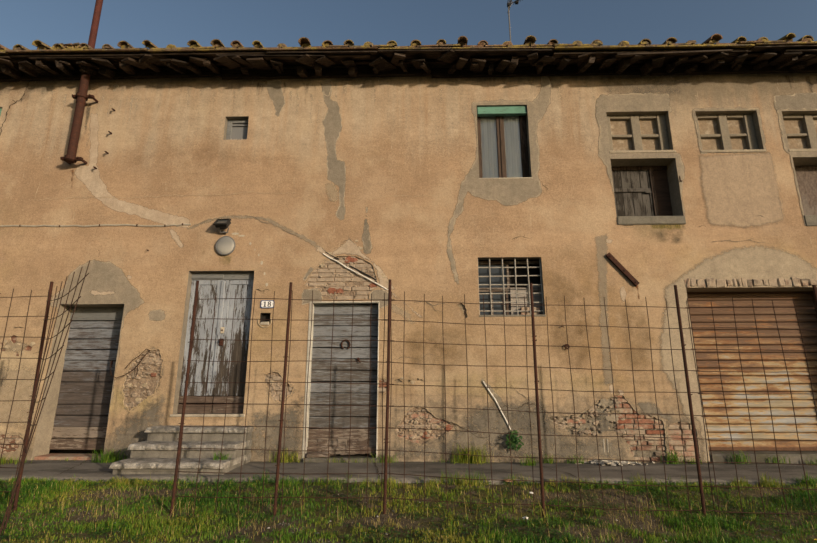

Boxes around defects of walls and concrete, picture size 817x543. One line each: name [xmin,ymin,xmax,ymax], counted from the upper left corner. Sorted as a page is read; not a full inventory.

crack [0,81,30,135]
flaking render [303,239,395,300]
flaking render [121,348,164,412]
flaking render [263,371,295,403]
flaking render [394,406,457,446]
flaking render [549,384,701,463]